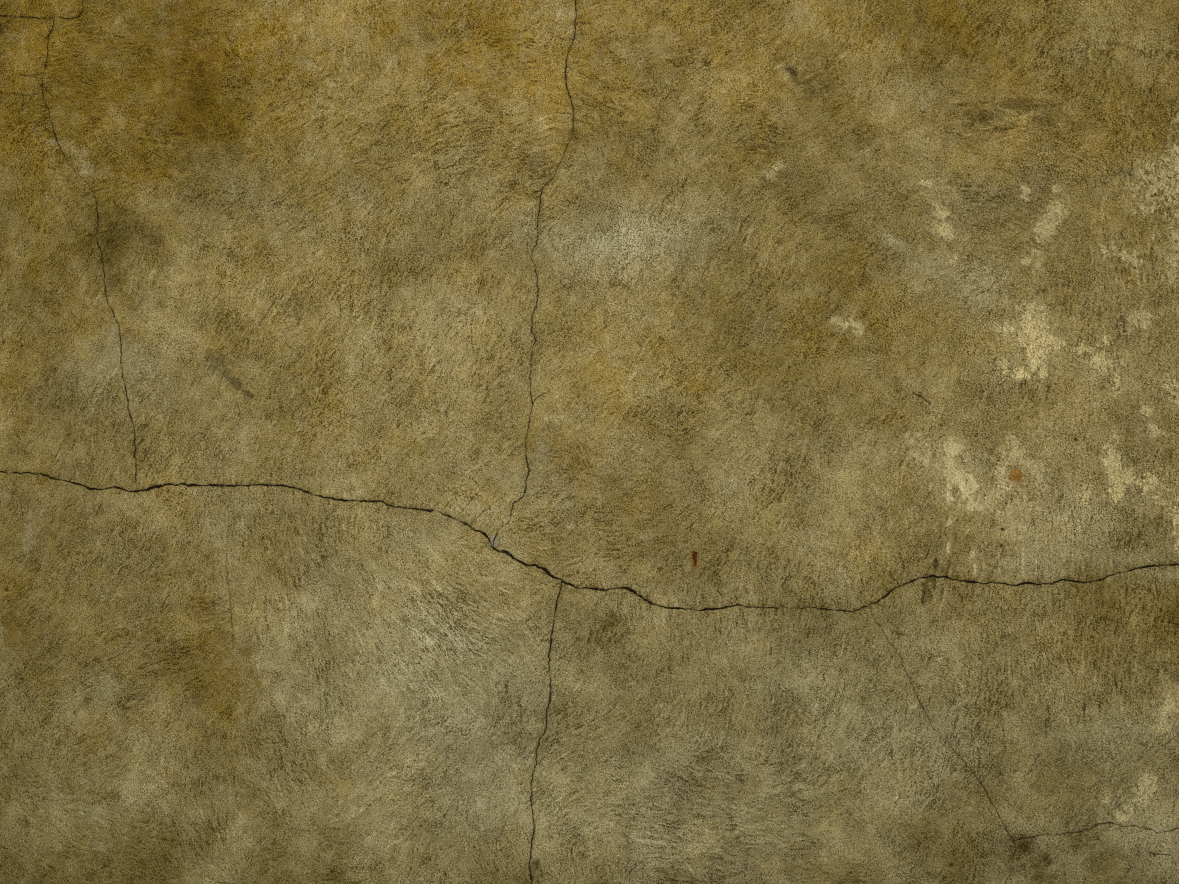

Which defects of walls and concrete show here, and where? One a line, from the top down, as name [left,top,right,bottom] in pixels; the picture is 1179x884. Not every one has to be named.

crack [0,0,83,155]
crack [565,0,577,130]
crack [0,161,774,884]
crack [812,563,1179,702]
crack [961,758,1178,855]